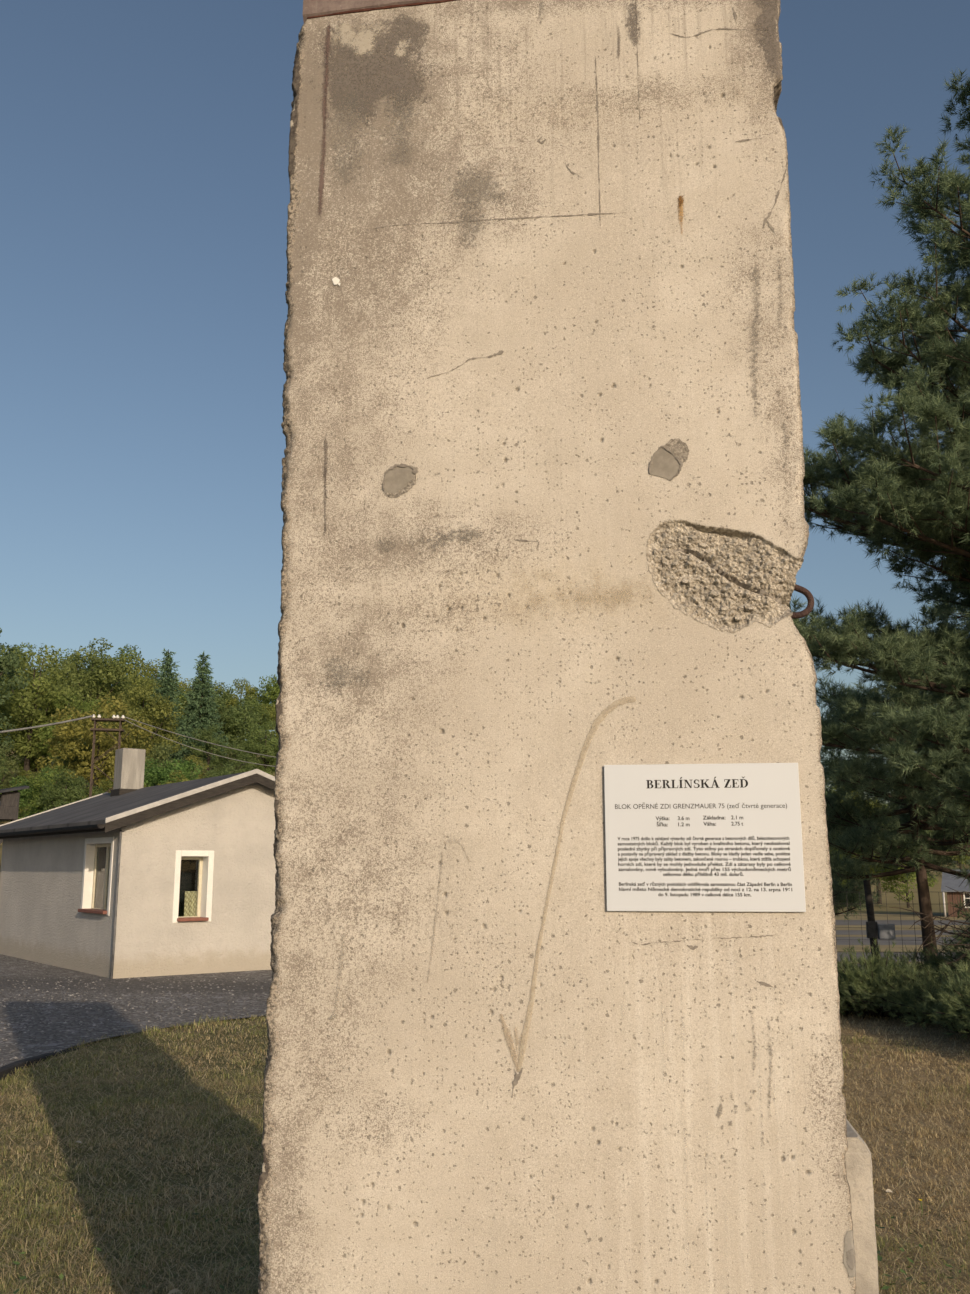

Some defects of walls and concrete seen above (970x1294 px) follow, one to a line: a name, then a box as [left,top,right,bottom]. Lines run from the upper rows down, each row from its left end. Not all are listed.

water stain [318,9,438,182]
spalling [385,475,416,498]
spalling [665,438,689,463]
spalling [646,520,804,633]